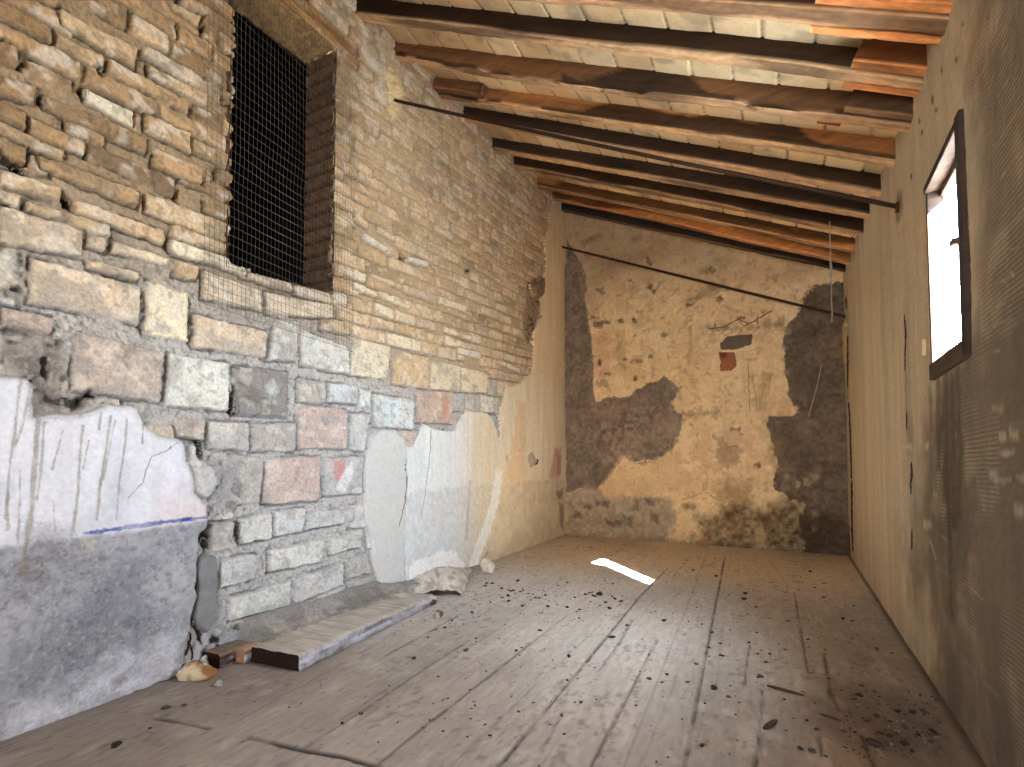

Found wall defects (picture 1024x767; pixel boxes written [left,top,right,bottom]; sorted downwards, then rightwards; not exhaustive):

flaking render [0,320,247,704]
crack [129,441,179,498]
peeling [328,457,354,494]
flaking render [404,201,688,581]
leakage [566,426,851,556]
spalling [753,281,851,510]